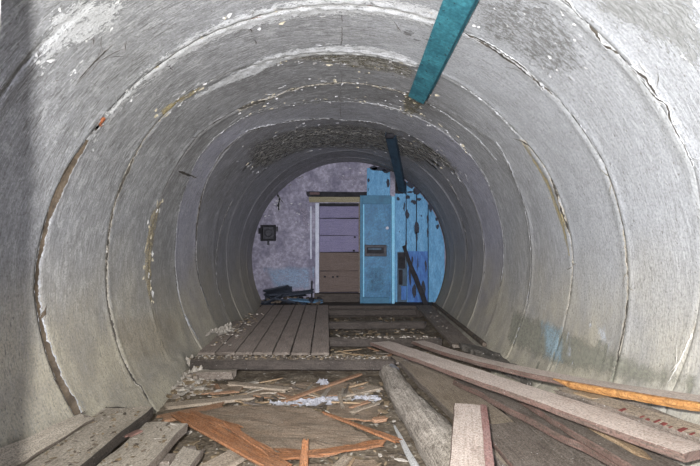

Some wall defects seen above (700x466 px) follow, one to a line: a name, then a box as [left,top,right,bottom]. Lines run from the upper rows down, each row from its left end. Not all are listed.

crack [33,42,191,416]
peeling [143,199,163,303]
peeling [92,0,439,153]
peeling [239,123,468,181]
crack [148,2,576,339]
crack [463,32,633,381]
crack [562,0,700,167]
leakage [509,313,666,383]